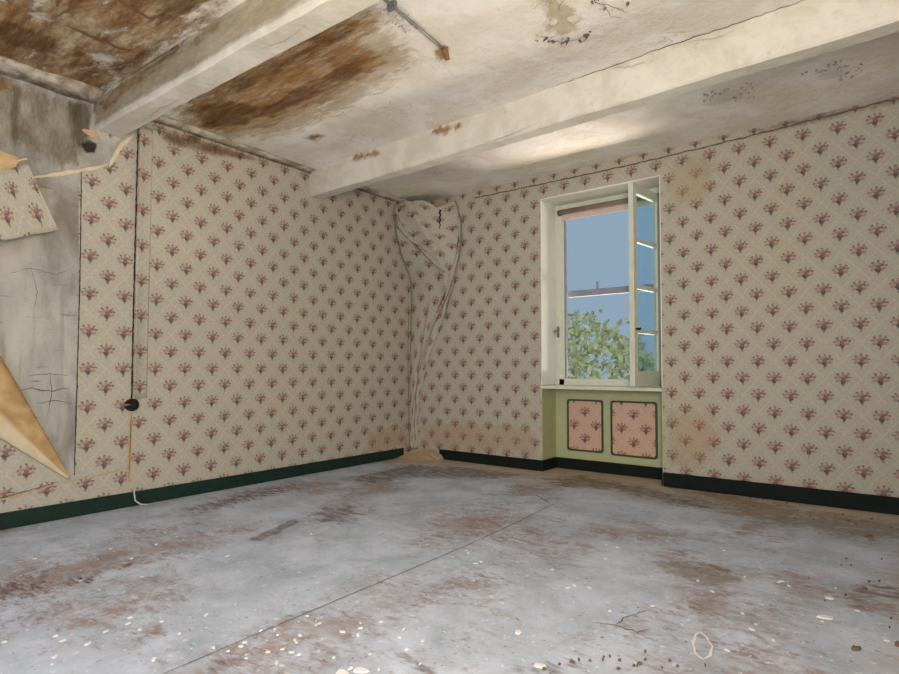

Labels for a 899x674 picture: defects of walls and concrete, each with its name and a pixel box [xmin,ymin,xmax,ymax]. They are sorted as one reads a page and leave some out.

water stain [0,0,298,164]
water stain [167,8,408,158]
peeling [533,0,582,44]
flaking render [0,74,132,480]